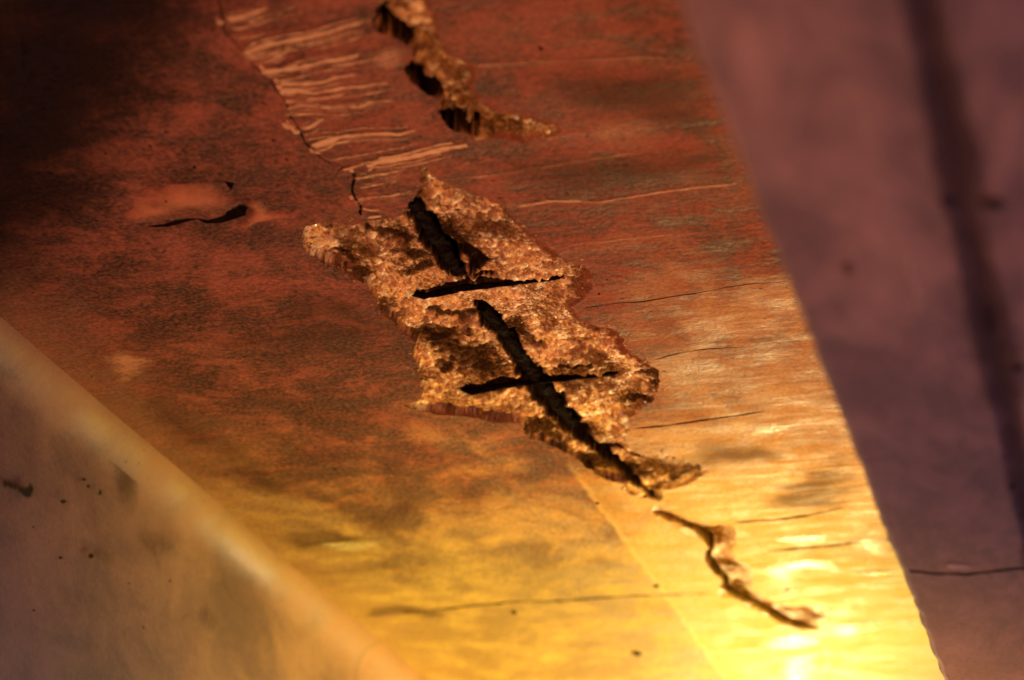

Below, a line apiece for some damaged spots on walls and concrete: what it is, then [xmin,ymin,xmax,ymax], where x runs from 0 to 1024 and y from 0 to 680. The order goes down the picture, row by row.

spalling [372,0,561,144]
spalling [236,165,713,503]
crack [586,281,785,308]
crack [656,347,740,360]
crack [635,411,766,429]
crack [366,506,842,631]